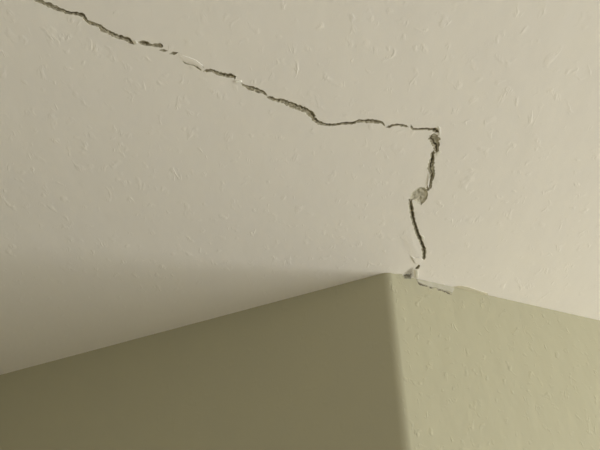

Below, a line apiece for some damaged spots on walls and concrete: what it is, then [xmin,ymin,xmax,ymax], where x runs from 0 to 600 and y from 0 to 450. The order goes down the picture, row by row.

crack [34,0,442,191]
crack [408,198,426,278]